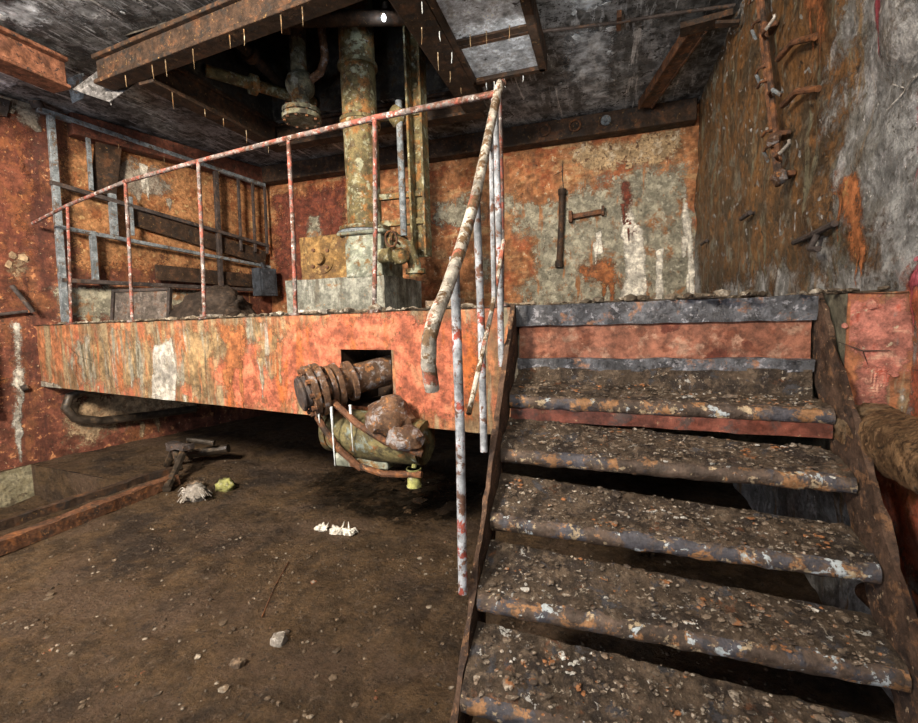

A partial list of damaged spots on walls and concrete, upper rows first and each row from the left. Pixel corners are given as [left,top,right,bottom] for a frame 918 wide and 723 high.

corrosion [0,115,45,306]
peeling [504,129,696,305]
leakage [620,209,664,299]
leakage [681,194,695,294]
corrosion [214,319,248,407]
peeling [841,256,918,418]
peeling [876,476,918,617]